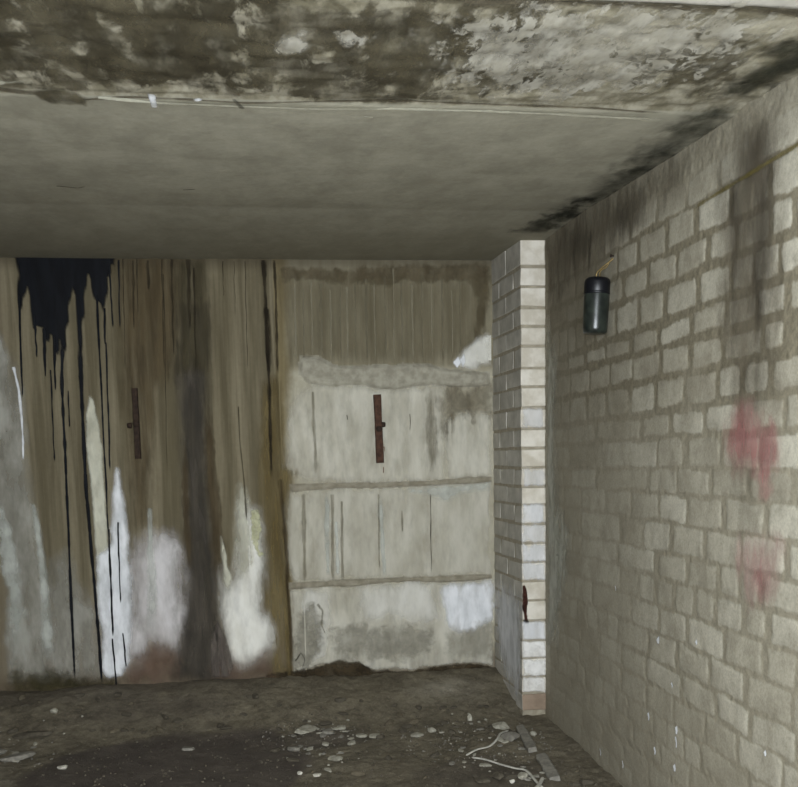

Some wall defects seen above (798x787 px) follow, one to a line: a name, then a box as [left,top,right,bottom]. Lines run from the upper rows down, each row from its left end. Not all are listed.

leakage [0,0,798,103]
leakage [532,109,726,231]
leakage [0,257,271,685]